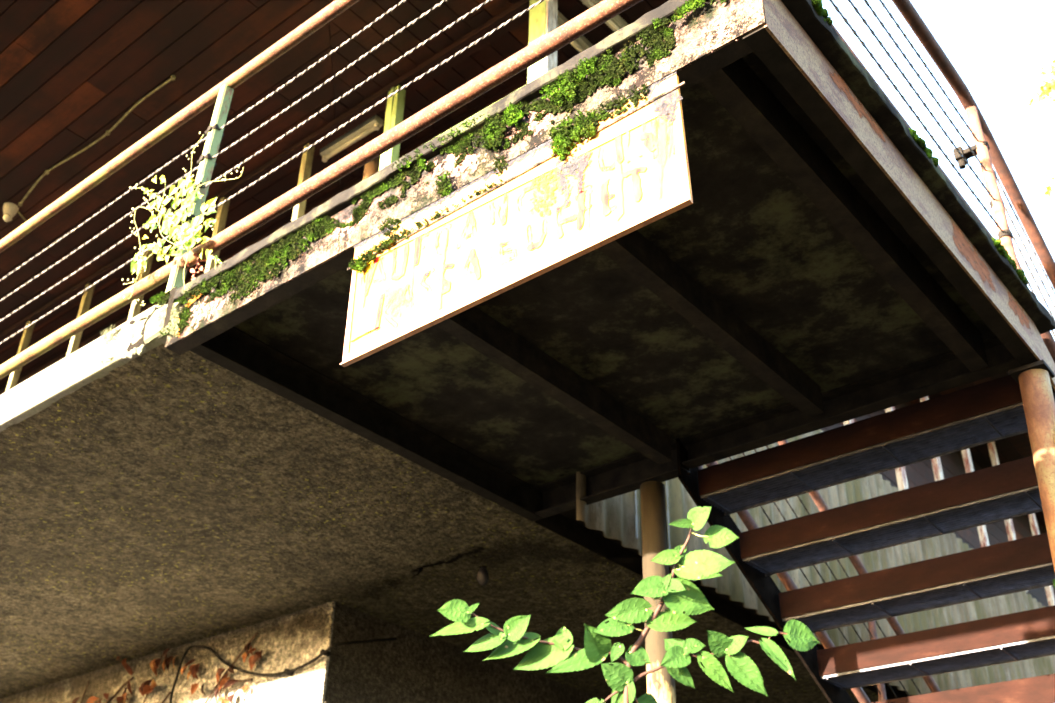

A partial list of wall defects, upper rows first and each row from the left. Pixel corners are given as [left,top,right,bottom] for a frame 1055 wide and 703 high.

water stain [587,72,683,126]
corrosion [830,72,886,142]
water stain [354,128,575,248]
water stain [531,153,591,217]
corrosion [951,221,1032,334]